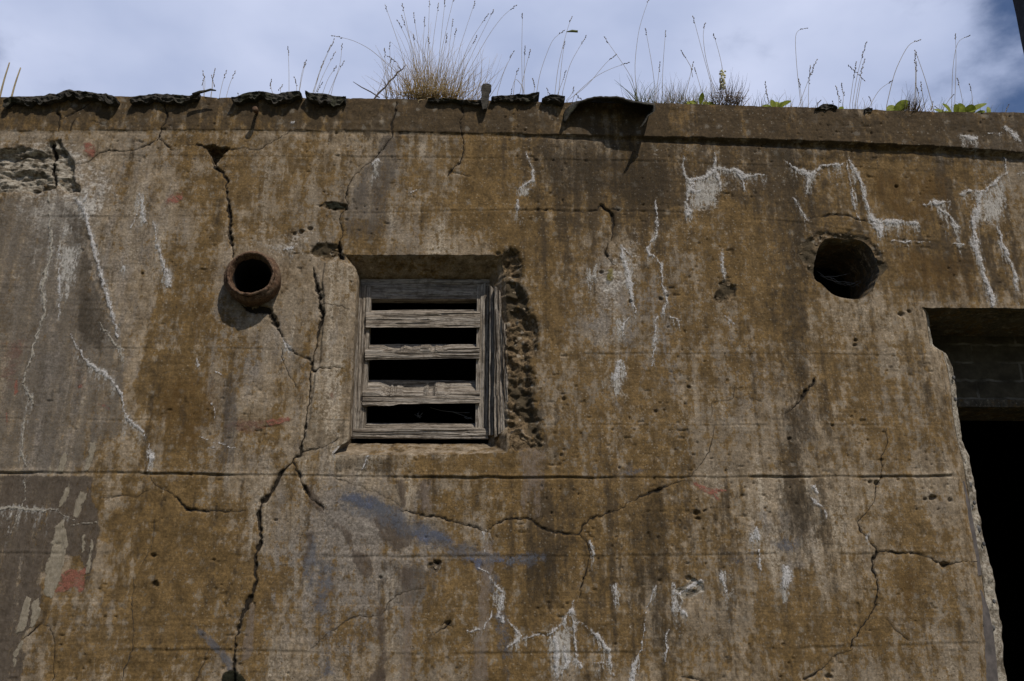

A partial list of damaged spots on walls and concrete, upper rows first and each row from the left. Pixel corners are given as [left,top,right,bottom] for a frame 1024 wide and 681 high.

spalling [0,140,80,194]
crack [338,101,398,260]
leakage [682,152,766,221]
leakage [789,160,924,243]
leakage [923,155,1021,306]
leakage [19,192,125,466]
crack [100,268,344,681]
spalling [496,248,543,453]
leakage [467,567,614,681]
crack [335,387,762,596]
crack [786,377,815,413]
crack [803,428,977,680]